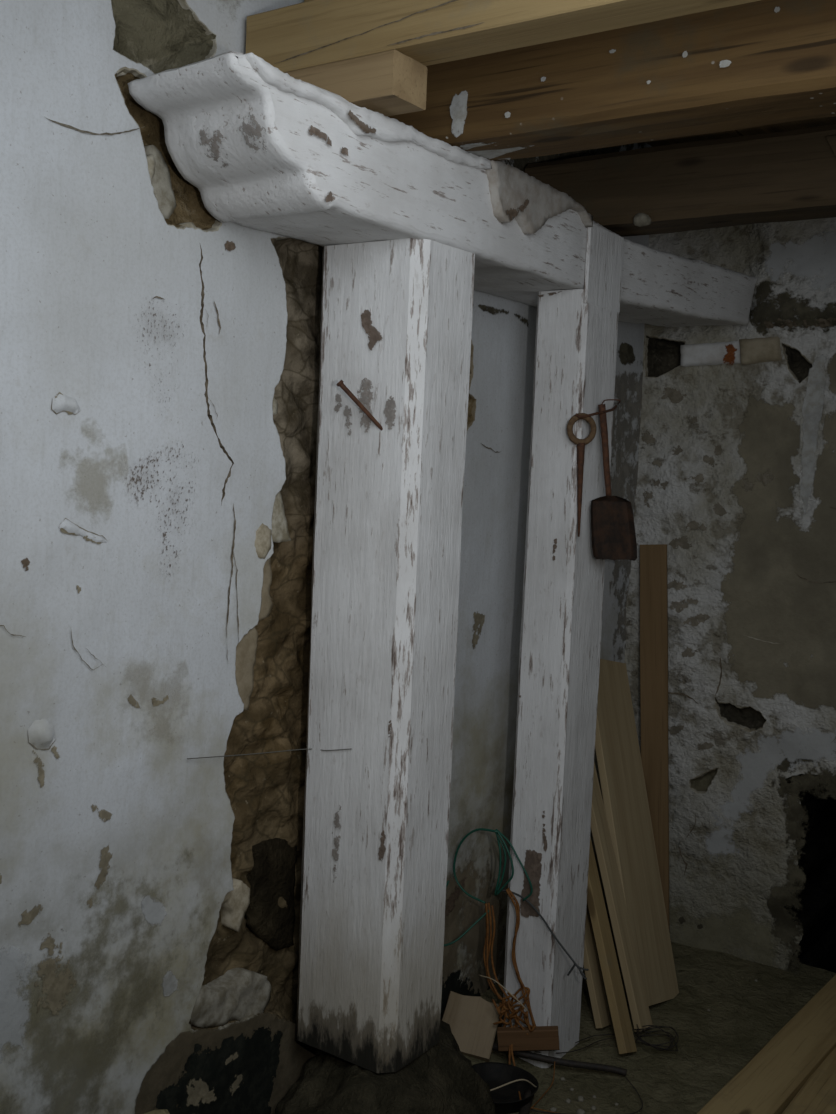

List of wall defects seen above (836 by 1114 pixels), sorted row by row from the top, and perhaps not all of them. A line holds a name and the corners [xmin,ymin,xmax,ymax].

crack [45,117,143,135]
spalling [111,0,222,232]
peeling [199,130,228,167]
peeling [243,52,593,234]
crack [199,245,239,660]
peeling [334,378,396,435]
peeling [361,310,382,350]
spalling [467,339,477,431]
spalling [782,343,813,384]
spalling [188,237,324,1032]
peeling [668,393,836,732]
damp [10,887,152,1114]